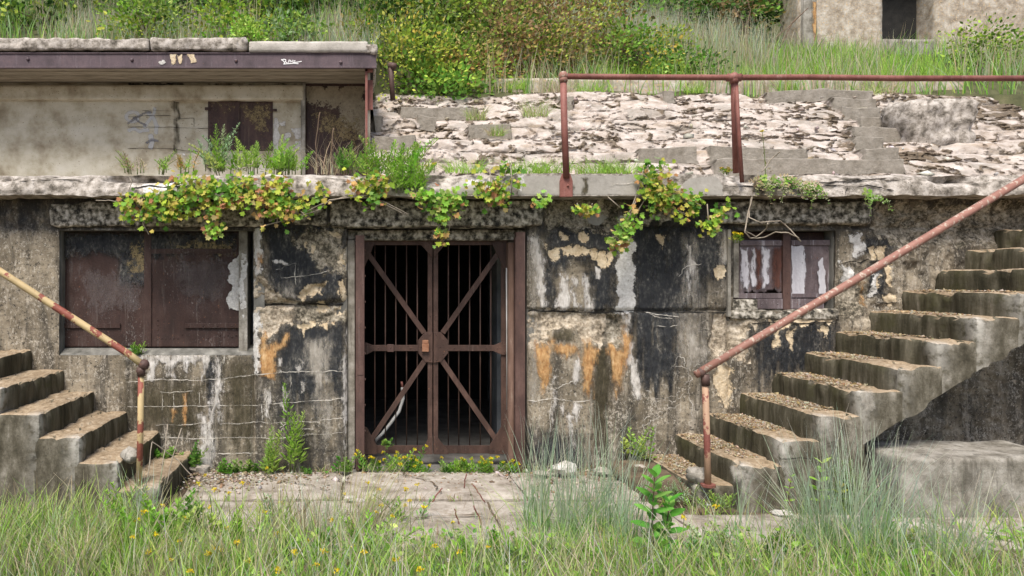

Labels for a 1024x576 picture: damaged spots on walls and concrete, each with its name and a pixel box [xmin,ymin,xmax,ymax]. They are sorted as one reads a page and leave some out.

peeling [142,183,177,194]
spalling [518,174,638,269]
leakage [127,320,347,471]
corrosion [260,332,288,378]
spalling [226,225,347,449]
corrosion [534,325,630,398]
leakage [527,216,733,399]
leakage [749,319,836,392]
spalling [707,199,1024,367]